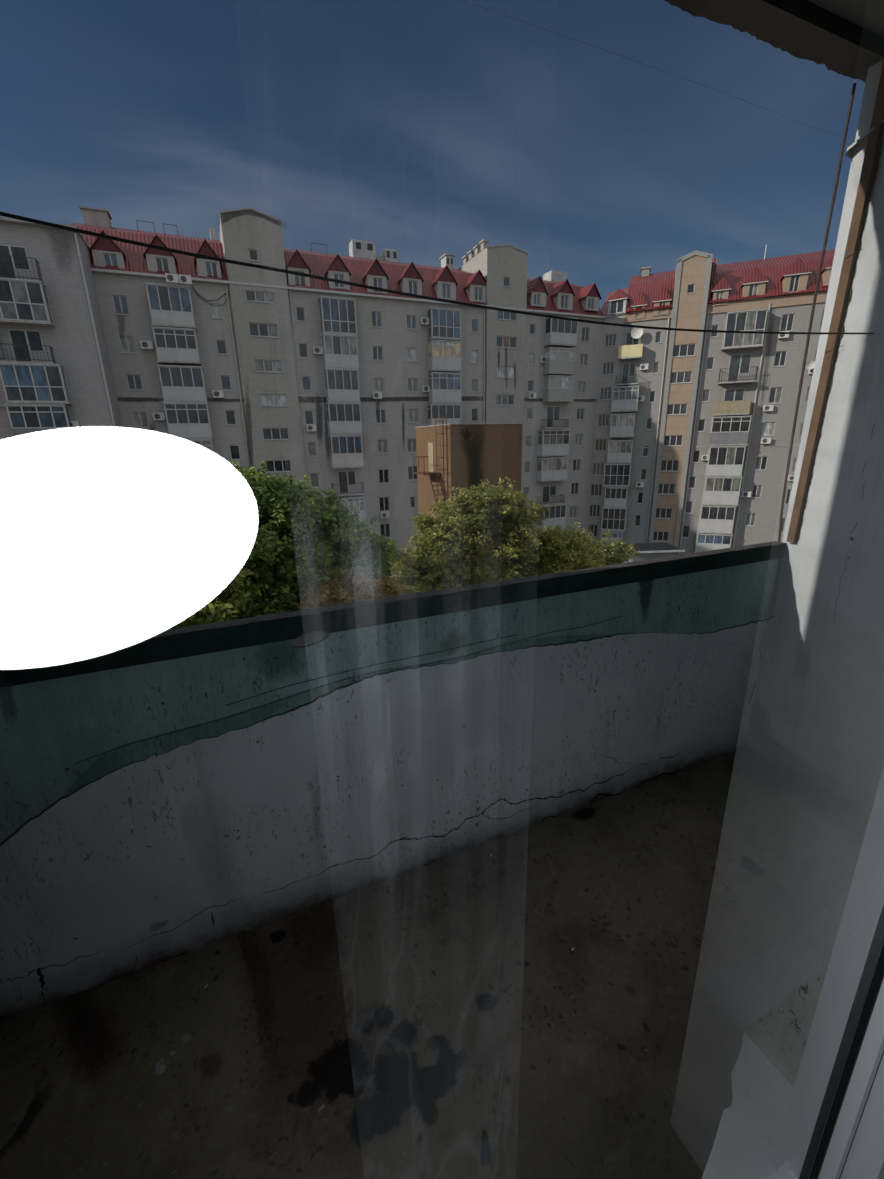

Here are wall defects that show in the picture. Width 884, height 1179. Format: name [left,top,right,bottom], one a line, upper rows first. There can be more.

leakage [464,429,482,489]
crack [1,753,703,1003]